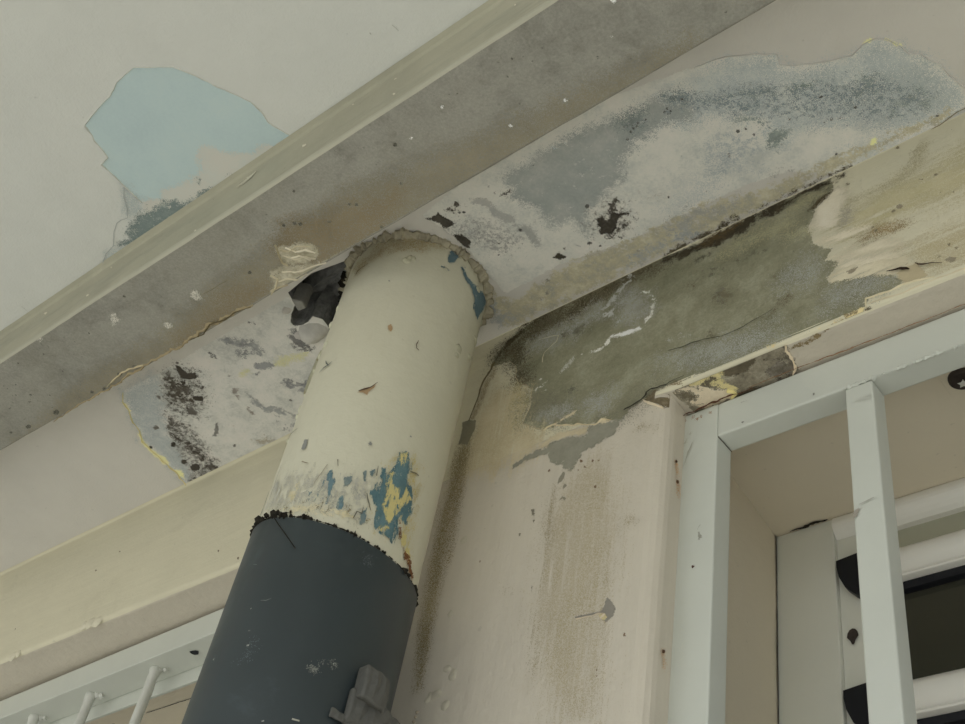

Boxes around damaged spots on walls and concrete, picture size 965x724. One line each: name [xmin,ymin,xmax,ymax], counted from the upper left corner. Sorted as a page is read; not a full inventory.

peeling [84,66,290,216]
peeling [54,240,354,486]
peeling [265,436,424,564]
water stain [398,520,414,578]
water stain [409,369,561,694]
water stain [7,15,965,482]
water stain [501,441,643,724]
peeling [423,32,965,500]